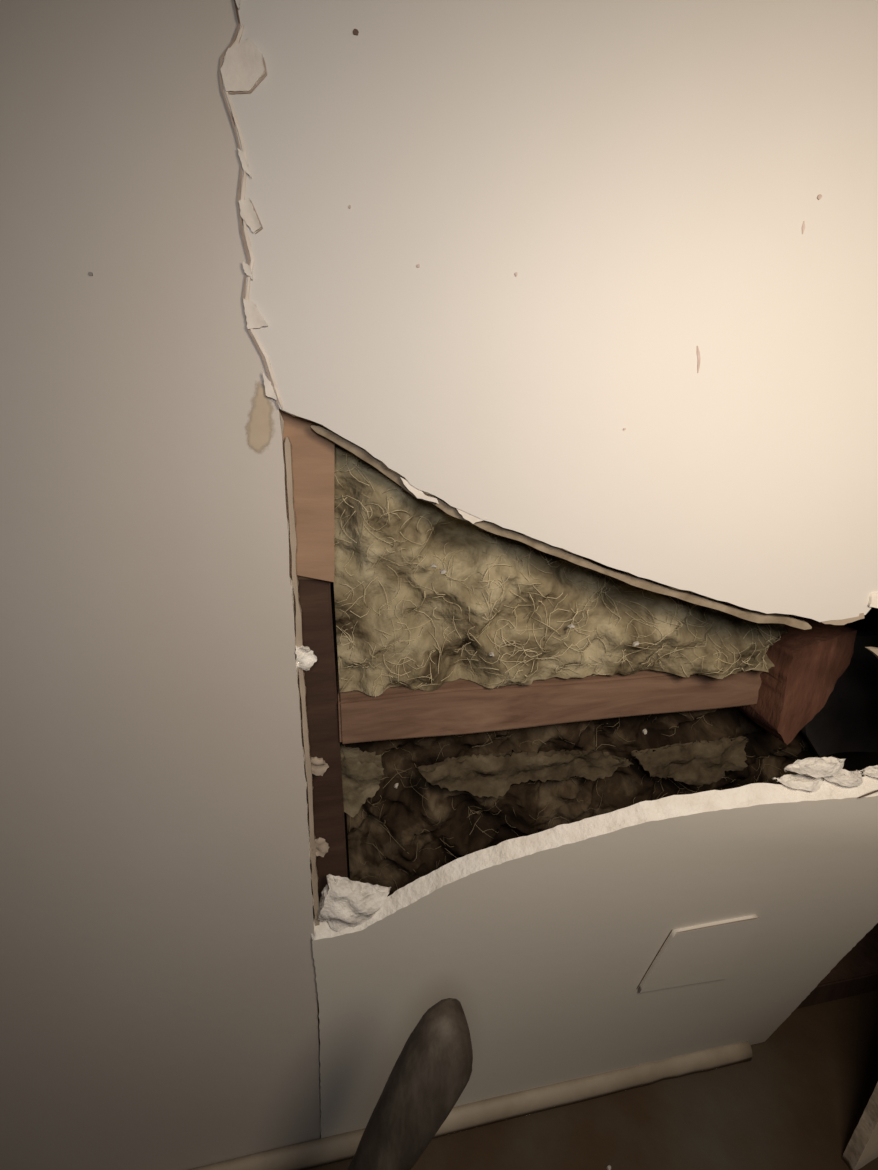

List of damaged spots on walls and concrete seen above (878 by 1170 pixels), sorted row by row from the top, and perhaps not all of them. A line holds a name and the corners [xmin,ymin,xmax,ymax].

crack [219,0,283,409]
peeling [400,477,439,504]
peeling [456,508,487,524]
peeling [821,592,878,625]